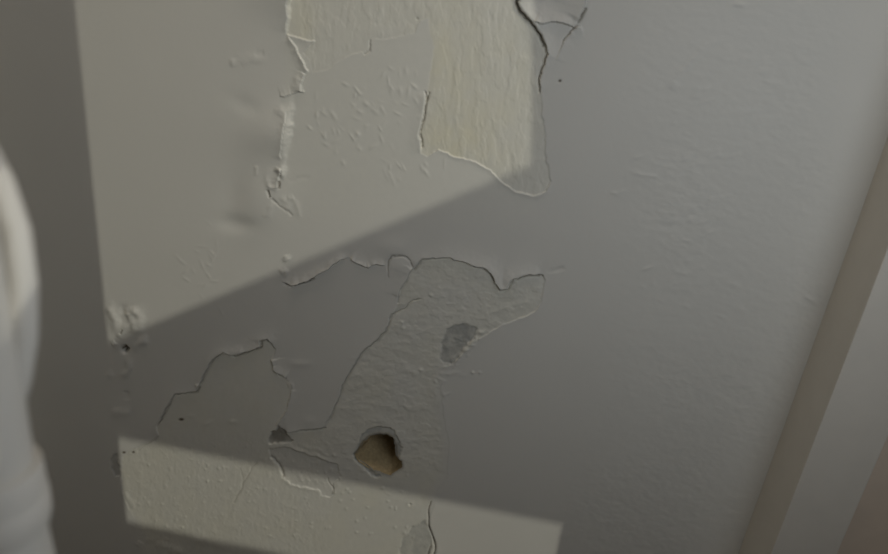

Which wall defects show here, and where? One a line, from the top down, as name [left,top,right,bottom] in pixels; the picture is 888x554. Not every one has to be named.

peeling [254,0,556,223]
peeling [111,327,438,554]
spalling [439,322,479,366]